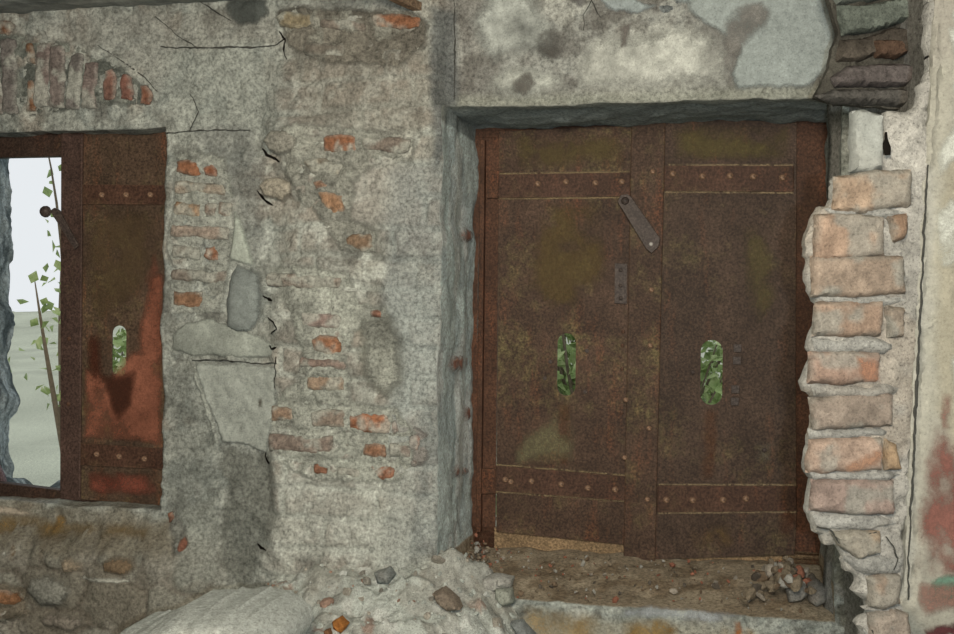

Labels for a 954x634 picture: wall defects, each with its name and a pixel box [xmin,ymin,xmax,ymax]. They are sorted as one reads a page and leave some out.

flaking render [0,20,154,117]
crack [155,16,287,59]
flaking render [476,0,551,55]
flaking render [494,71,559,95]
leakage [725,4,768,69]
flaking render [166,148,234,316]
flaking render [282,122,415,253]
flaking render [580,0,935,634]
flaking render [194,266,428,482]
peeling [920,439,954,612]
leakage [626,608,722,634]
peeling [926,624,954,634]